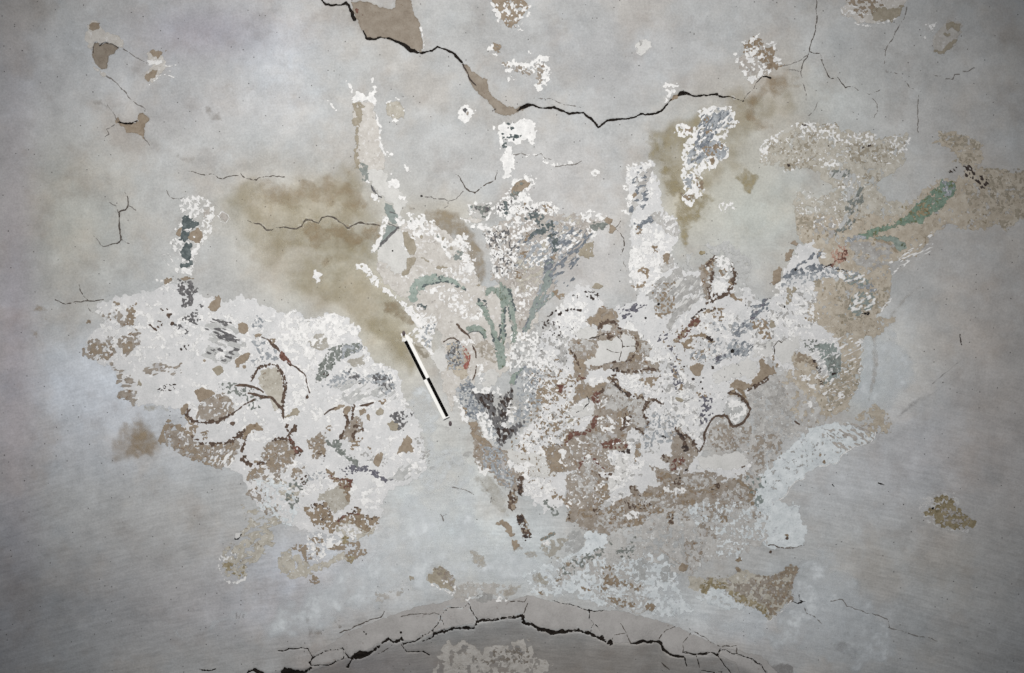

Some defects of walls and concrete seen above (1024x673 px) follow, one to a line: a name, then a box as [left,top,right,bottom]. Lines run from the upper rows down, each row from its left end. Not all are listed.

spalling [84,20,124,77]
spalling [351,0,425,52]
crack [321,0,476,85]
flaking render [490,0,531,31]
crack [492,0,919,133]
water stain [652,118,700,155]
crack [247,216,380,231]
water stain [663,167,707,245]
water stain [738,174,756,193]
flaking render [346,64,1024,622]
peeling [82,195,422,584]
crack [247,598,766,673]